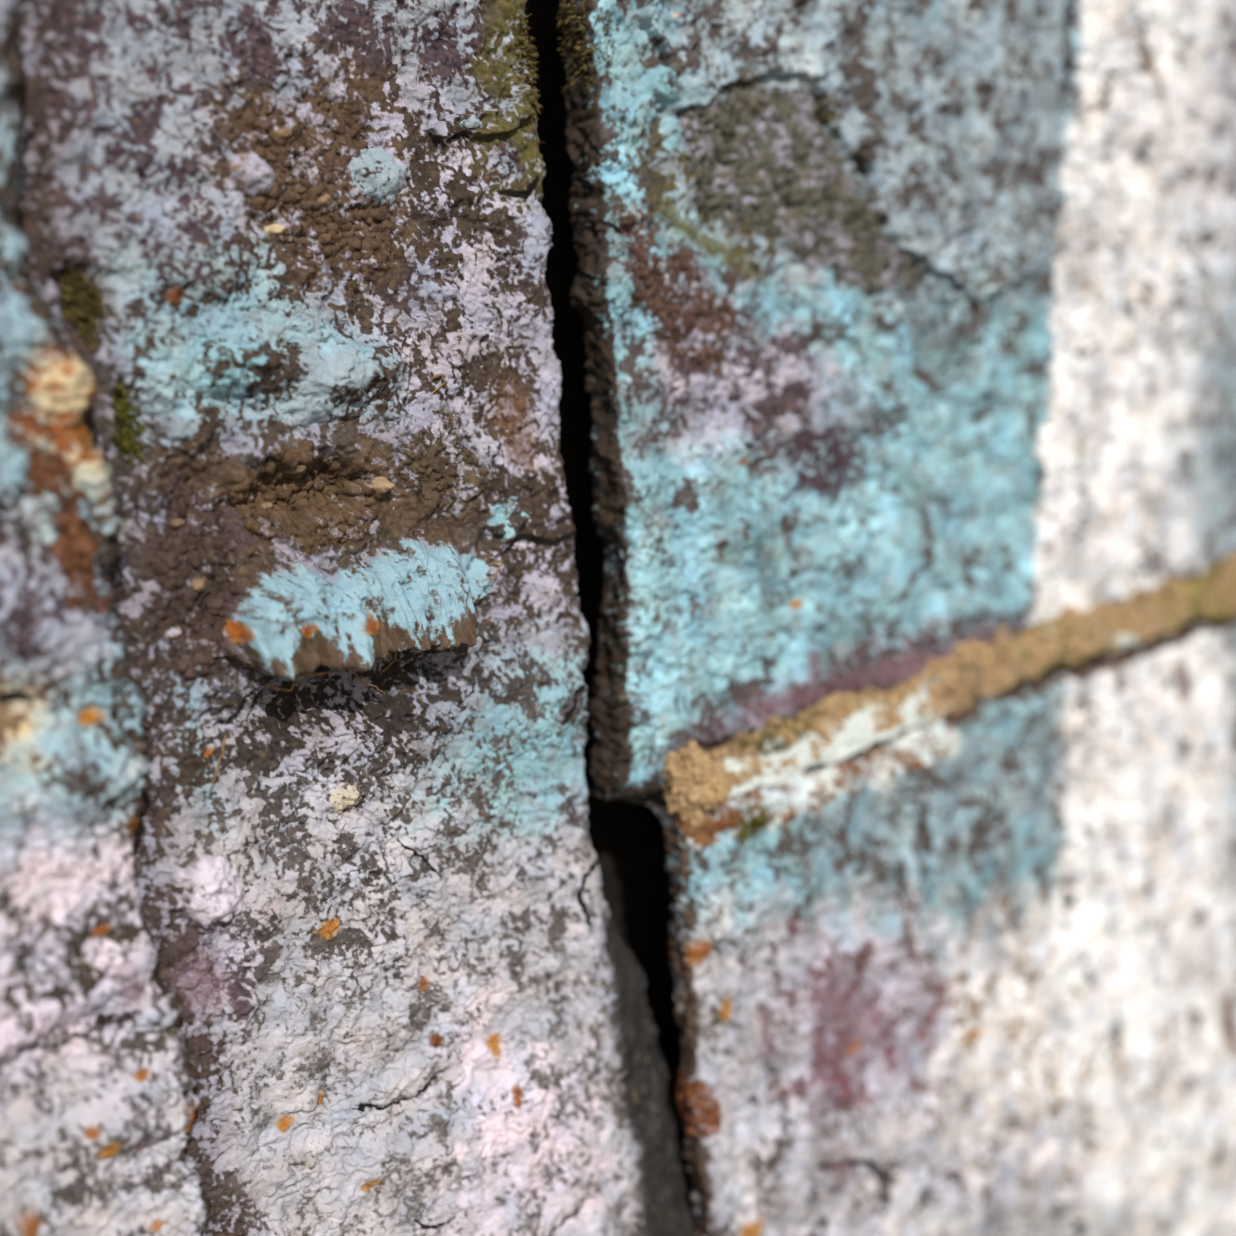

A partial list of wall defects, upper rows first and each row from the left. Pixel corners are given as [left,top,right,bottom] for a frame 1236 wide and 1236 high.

spalling [149,329,535,692]
crack [498,0,624,750]
crack [576,793,687,1138]
crack [550,1179,613,1236]